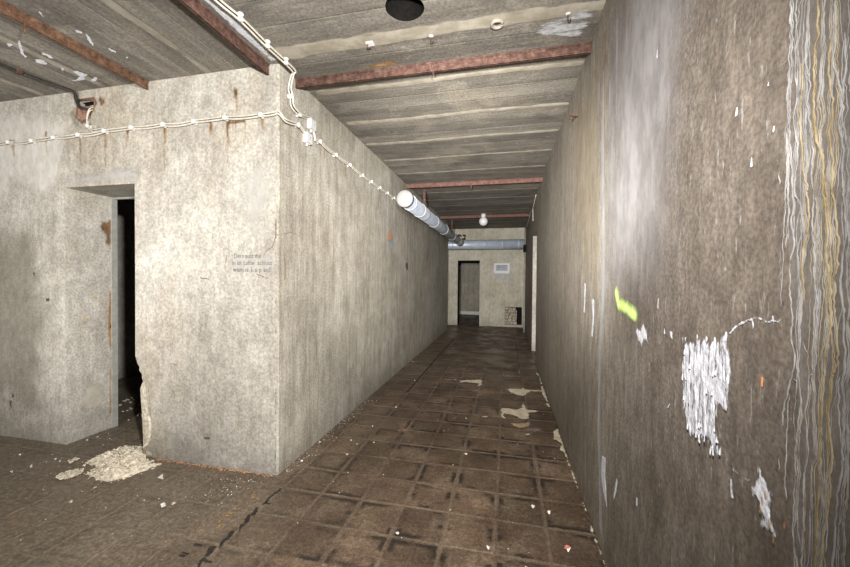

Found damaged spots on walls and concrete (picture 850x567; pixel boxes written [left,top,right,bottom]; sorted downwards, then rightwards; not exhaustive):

water stain [537,1,594,37]
corrosion [101,220,111,244]
water stain [778,0,850,567]
spalling [135,356,152,456]